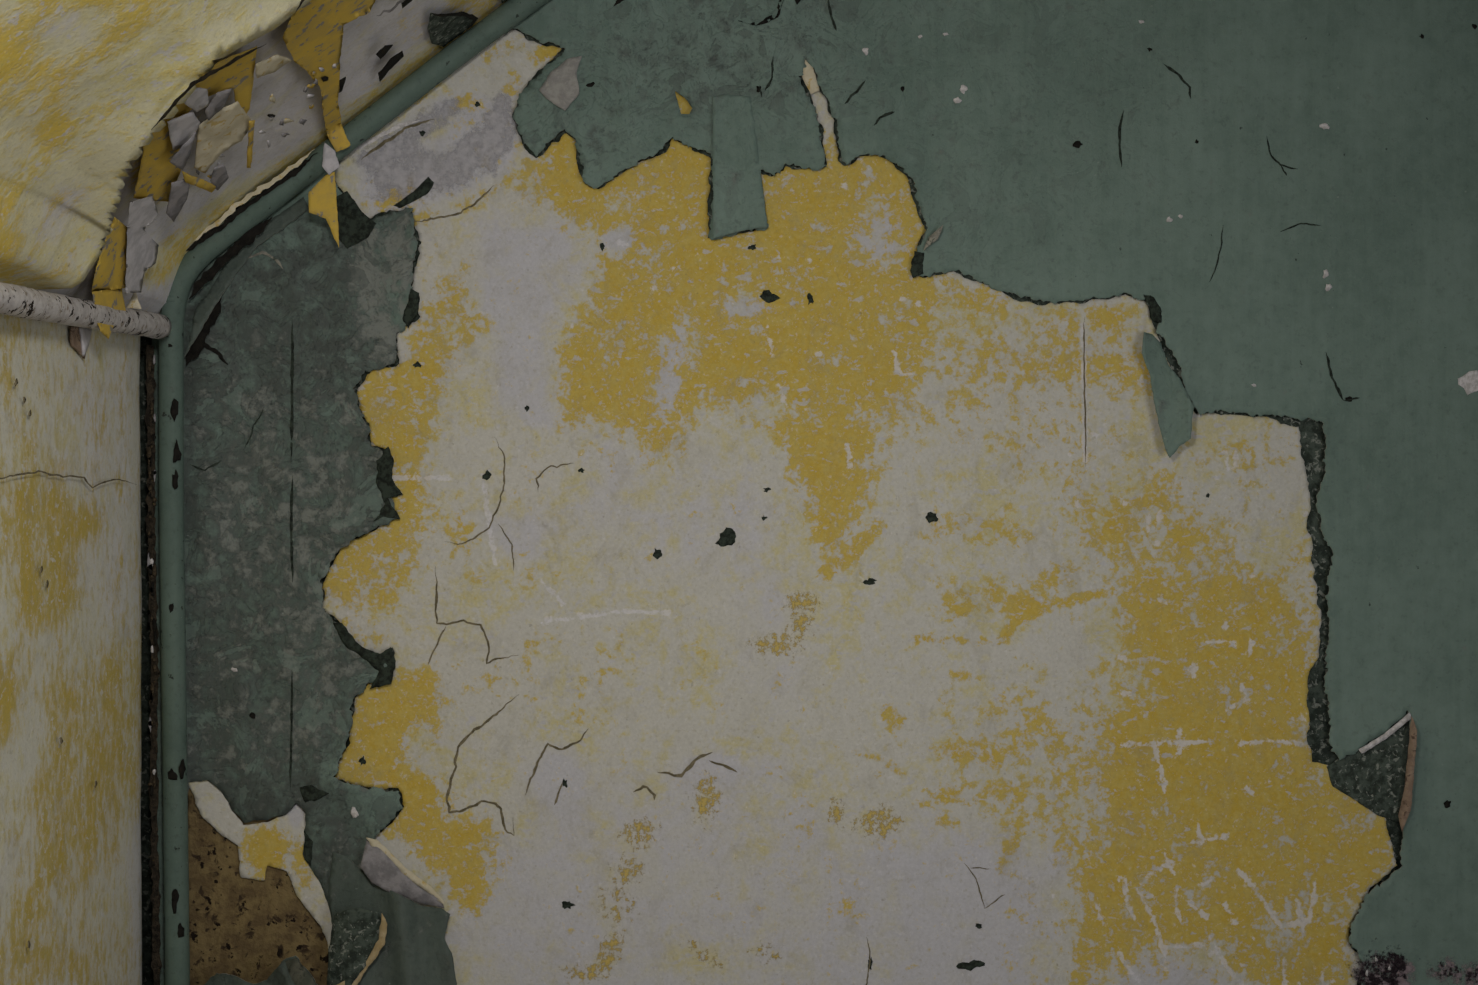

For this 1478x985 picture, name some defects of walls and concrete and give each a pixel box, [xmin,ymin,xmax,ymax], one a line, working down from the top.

peeling [428,11,478,47]
peeling [738,0,801,25]
peeling [91,46,291,311]
peeling [184,0,376,358]
peeling [69,323,114,359]
spalling [170,399,182,489]
crack [428,442,571,664]
peeling [322,30,1417,985]
crack [446,695,588,836]
crack [634,752,737,800]
flaking render [188,780,332,985]
damp [1348,946,1478,985]